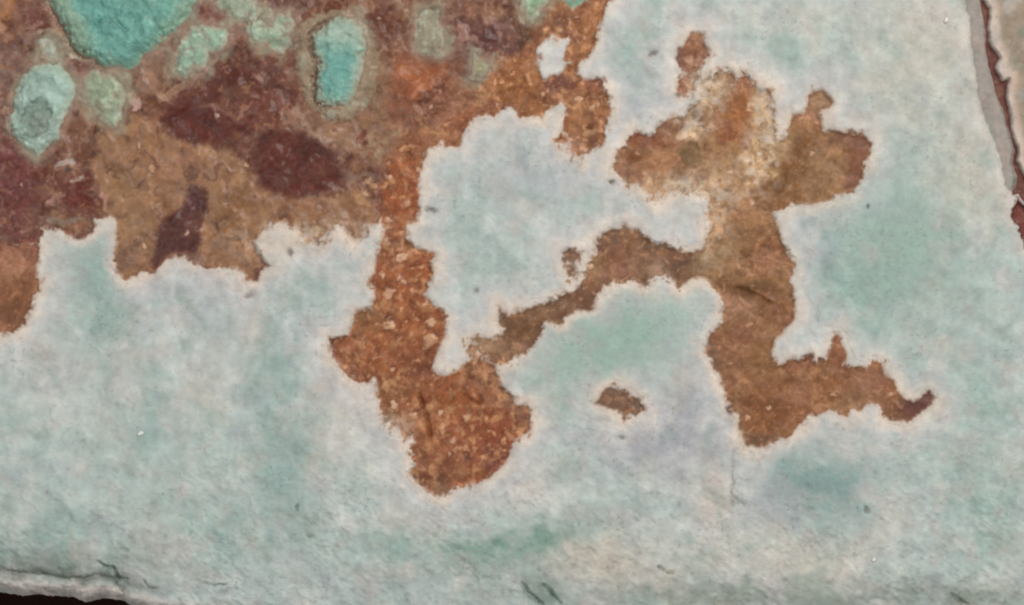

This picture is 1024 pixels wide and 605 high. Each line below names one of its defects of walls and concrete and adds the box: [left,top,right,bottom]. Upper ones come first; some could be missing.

corrosion [0,240,46,340]
spalling [0,0,532,301]
corrosion [325,0,939,500]